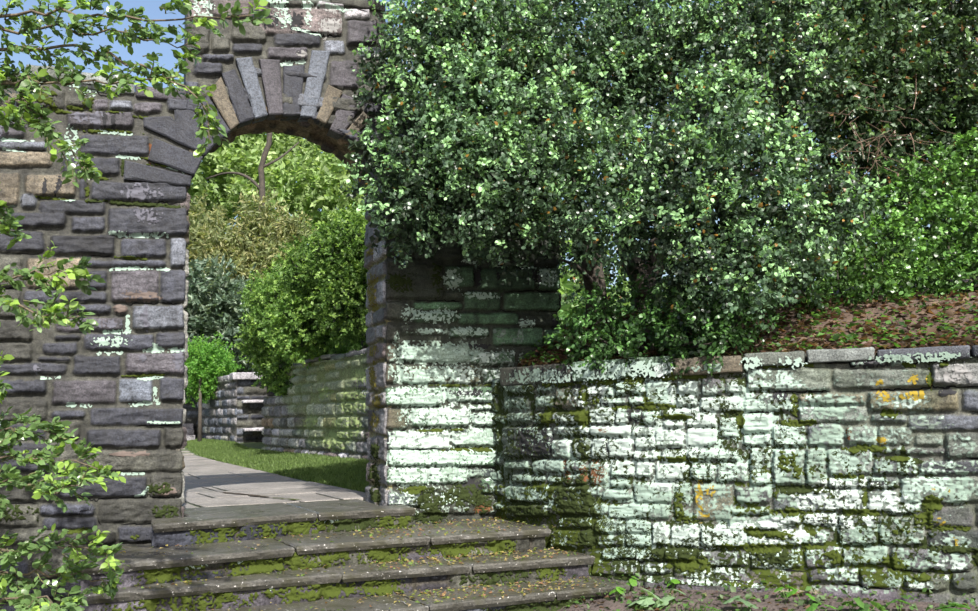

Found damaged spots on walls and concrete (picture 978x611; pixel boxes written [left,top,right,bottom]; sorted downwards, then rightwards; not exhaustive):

leakage [557,363,581,399]
leakage [934,361,973,397]
leakage [626,407,642,427]
leakage [513,418,554,464]
leakage [462,478,490,495]